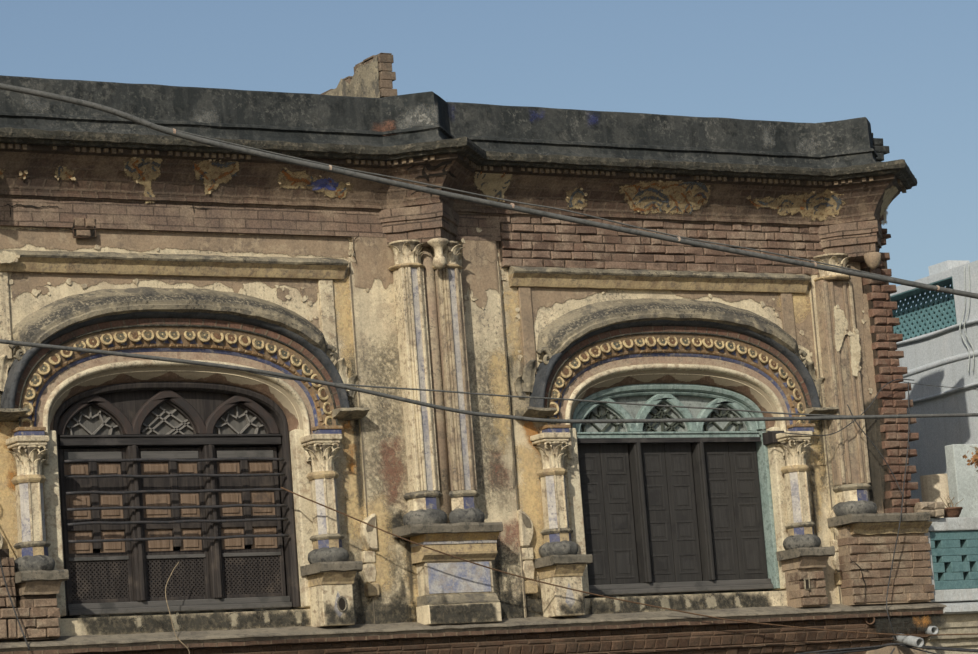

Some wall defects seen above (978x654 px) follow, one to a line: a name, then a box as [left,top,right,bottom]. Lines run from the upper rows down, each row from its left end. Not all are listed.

crack [407,161,456,196]
flaking render [0,228,395,328]
flaking render [530,287,607,325]
flaking render [461,188,825,314]
flaking render [845,293,877,400]
water stain [325,344,417,625]
water stain [79,607,310,635]
water stain [429,522,543,624]